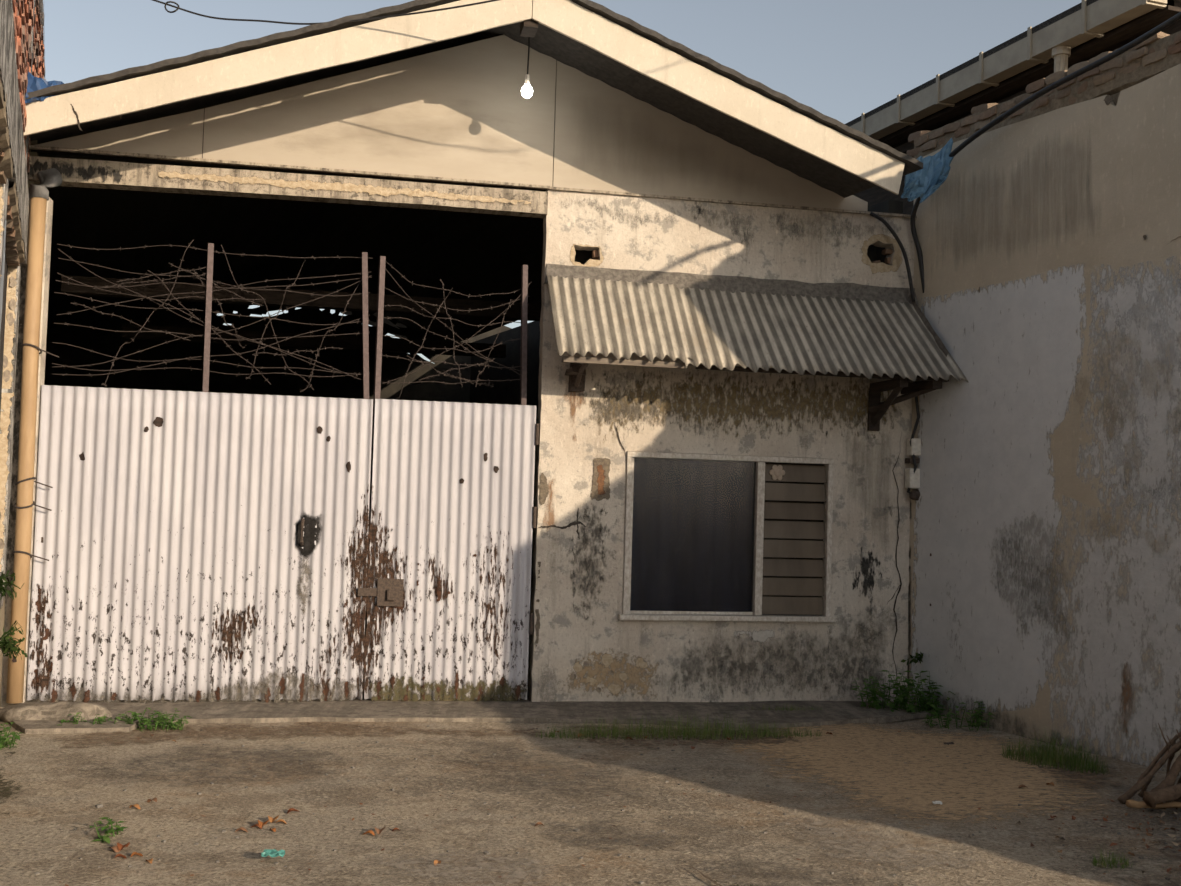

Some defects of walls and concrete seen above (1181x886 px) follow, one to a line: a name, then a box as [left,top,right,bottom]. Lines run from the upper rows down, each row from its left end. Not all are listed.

leakage [583,374,664,424]
corrosion [28,584,63,696]
corrosion [211,601,266,670]
corrosion [305,484,523,701]
leakage [570,506,610,623]
leakage [568,651,658,696]
leakage [673,547,882,693]
peeling [910,264,1181,770]